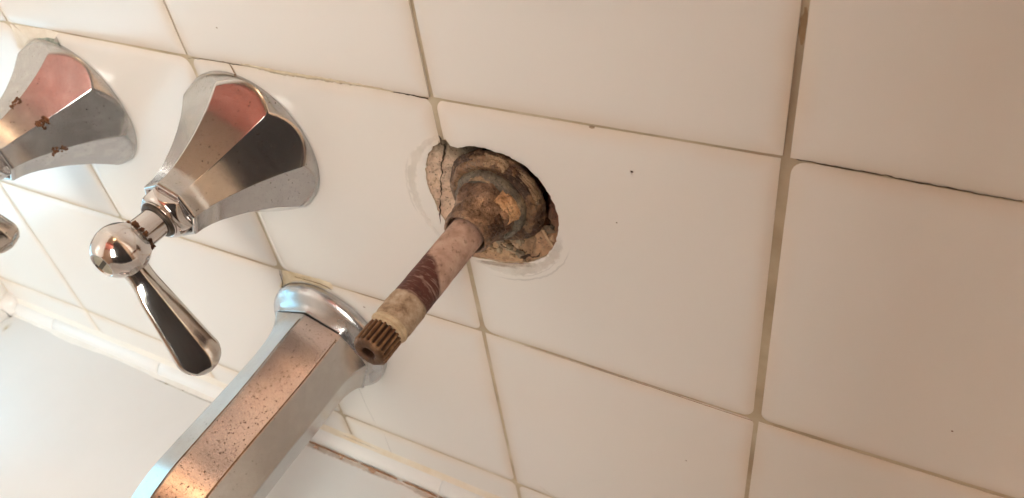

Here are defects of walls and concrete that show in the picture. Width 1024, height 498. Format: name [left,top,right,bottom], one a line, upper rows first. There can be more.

spalling [426,140,559,262]